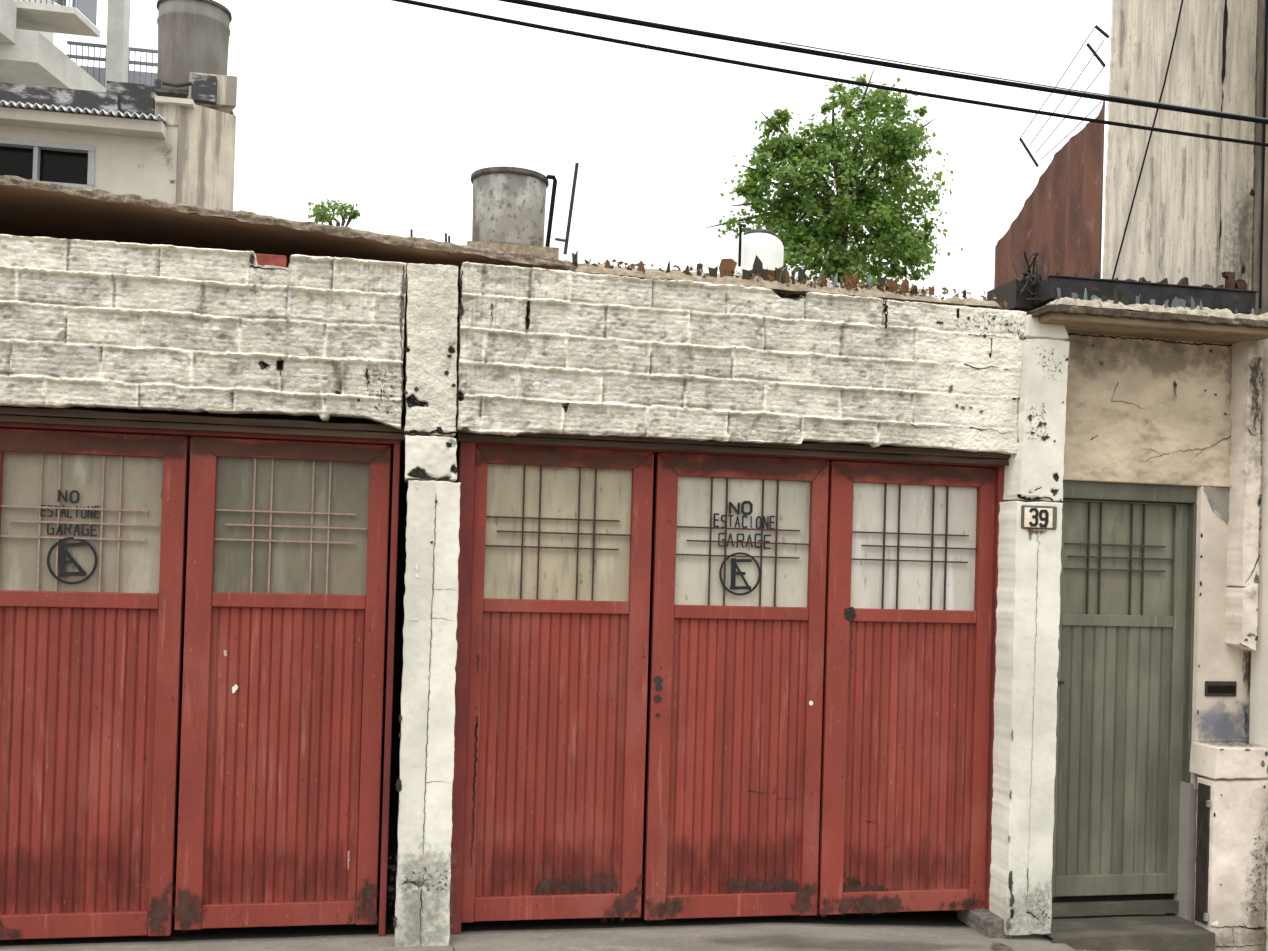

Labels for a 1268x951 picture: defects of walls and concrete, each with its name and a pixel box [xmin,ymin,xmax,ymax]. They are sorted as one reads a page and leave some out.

crack [1140,436,1231,461]
water stain [1201,705,1250,743]